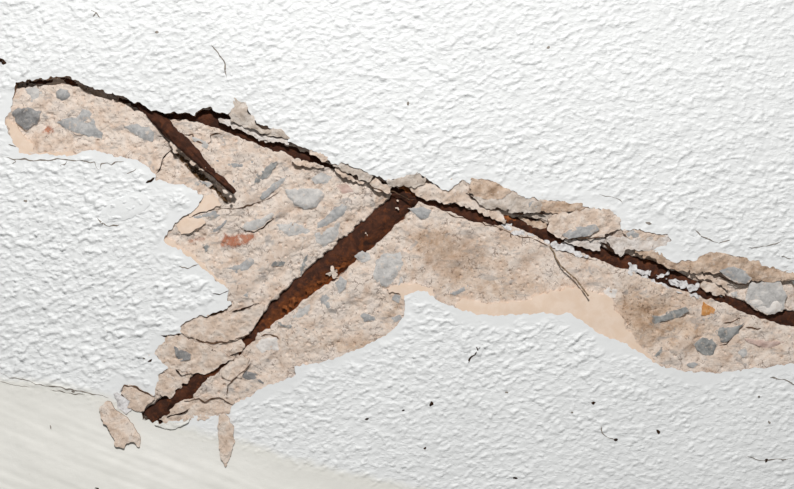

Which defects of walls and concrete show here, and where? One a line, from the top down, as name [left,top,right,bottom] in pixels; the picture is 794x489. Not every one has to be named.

corrosion [221,234,254,247]
spalling [5,77,794,467]